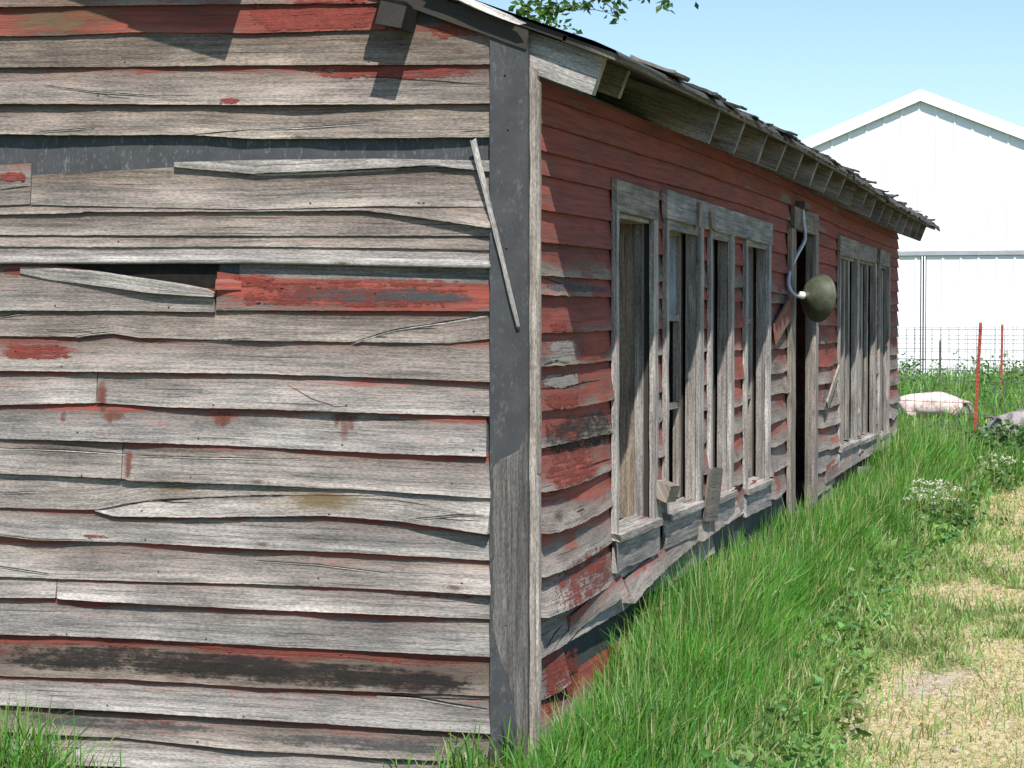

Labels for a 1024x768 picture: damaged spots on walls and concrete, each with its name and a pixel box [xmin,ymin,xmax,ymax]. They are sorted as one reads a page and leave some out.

peeling [249,0,374,31]
peeling [230,274,466,308]
crack [351,314,487,345]
peeling [541,323,580,409]
peeling [543,446,596,494]
crack [99,495,267,510]
crack [546,624,584,652]
damp [5,643,469,693]